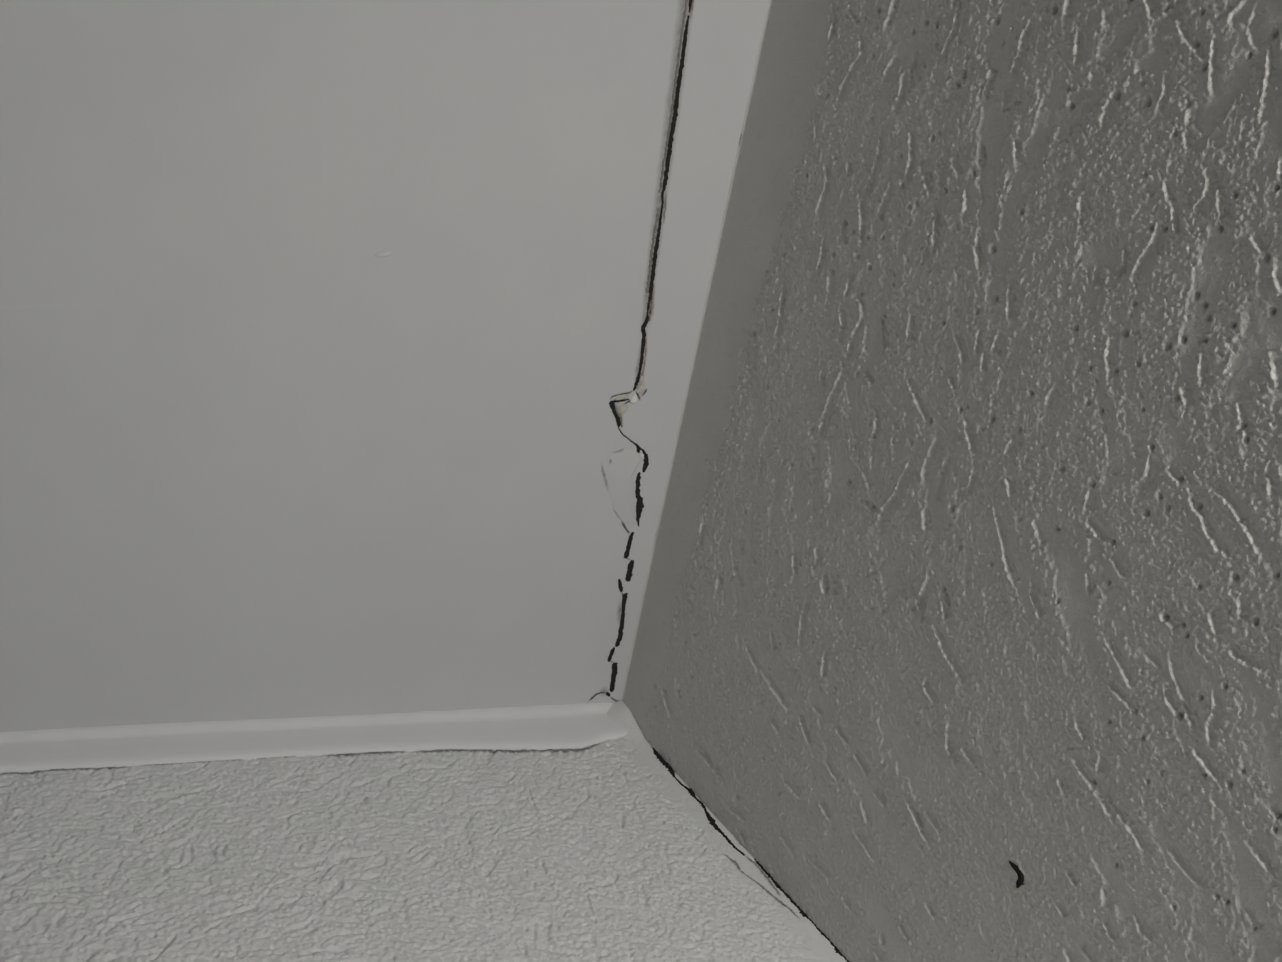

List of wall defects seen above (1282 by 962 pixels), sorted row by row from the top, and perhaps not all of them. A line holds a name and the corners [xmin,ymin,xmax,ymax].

peeling [615,375,646,417]
crack [590,0,694,702]
crack [652,747,850,962]